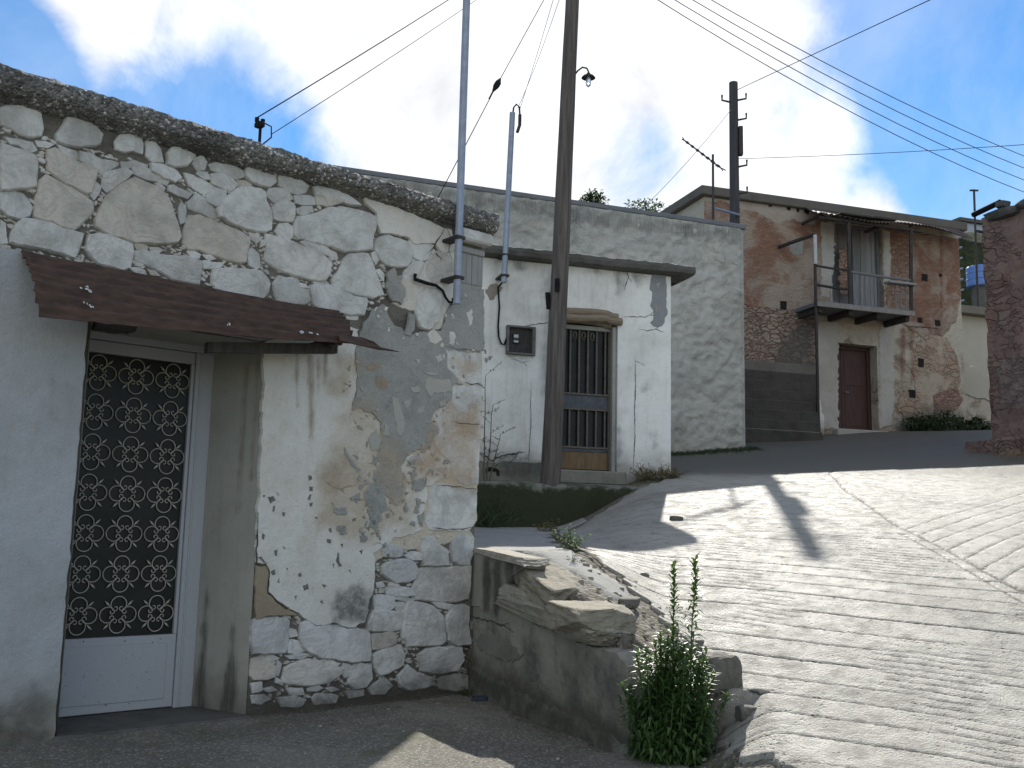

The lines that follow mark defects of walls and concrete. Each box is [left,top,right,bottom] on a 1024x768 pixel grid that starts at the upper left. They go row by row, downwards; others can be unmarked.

flaking render [327,268,503,572]
spalling [254,546,309,620]